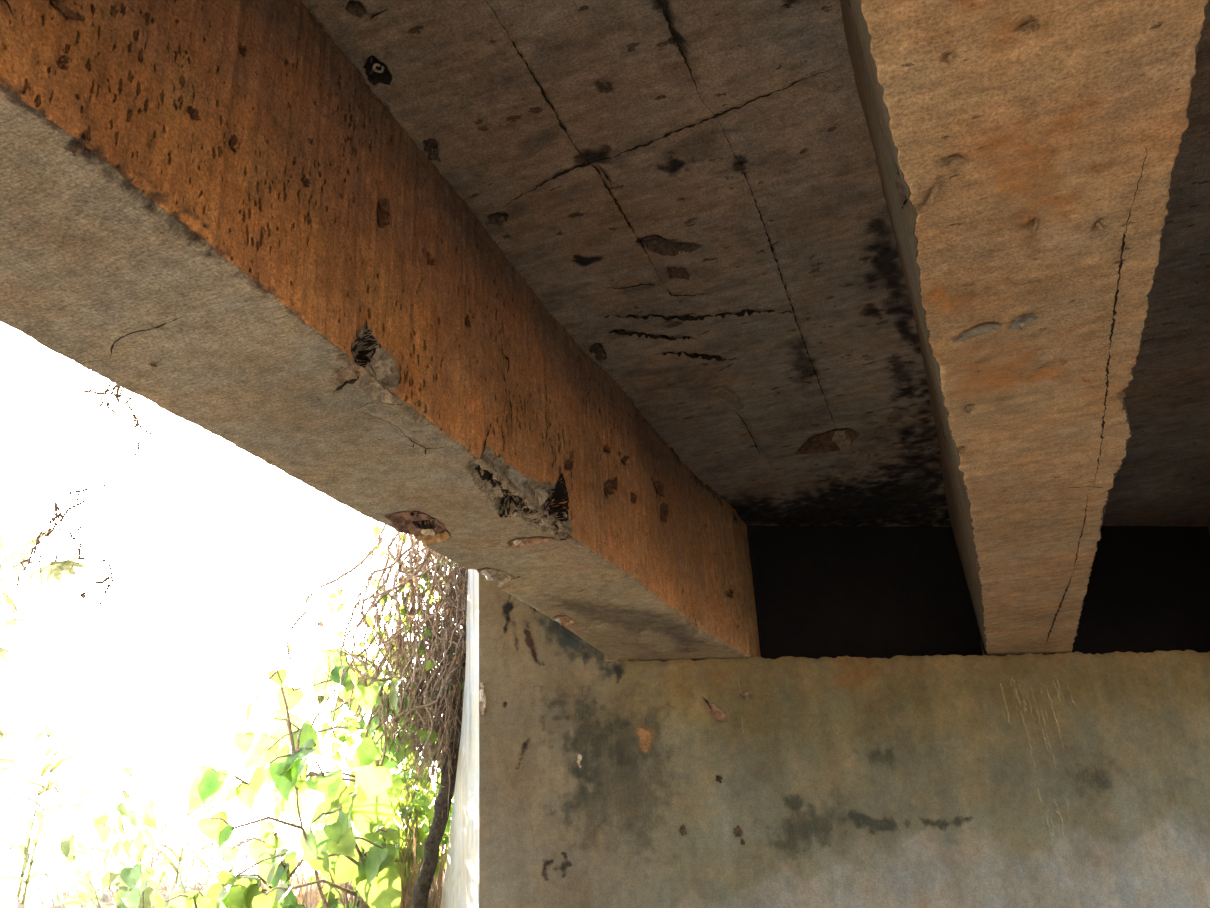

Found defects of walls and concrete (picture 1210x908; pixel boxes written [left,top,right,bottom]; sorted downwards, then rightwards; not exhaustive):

crack [499,66,839,211]
spalling [333,320,399,404]
crack [602,284,793,372]
crack [1045,148,1147,646]
spalling [462,413,581,548]
spalling [384,511,451,547]
leakage [503,601,622,682]
leakage [848,812,896,833]
leakage [922,817,970,829]